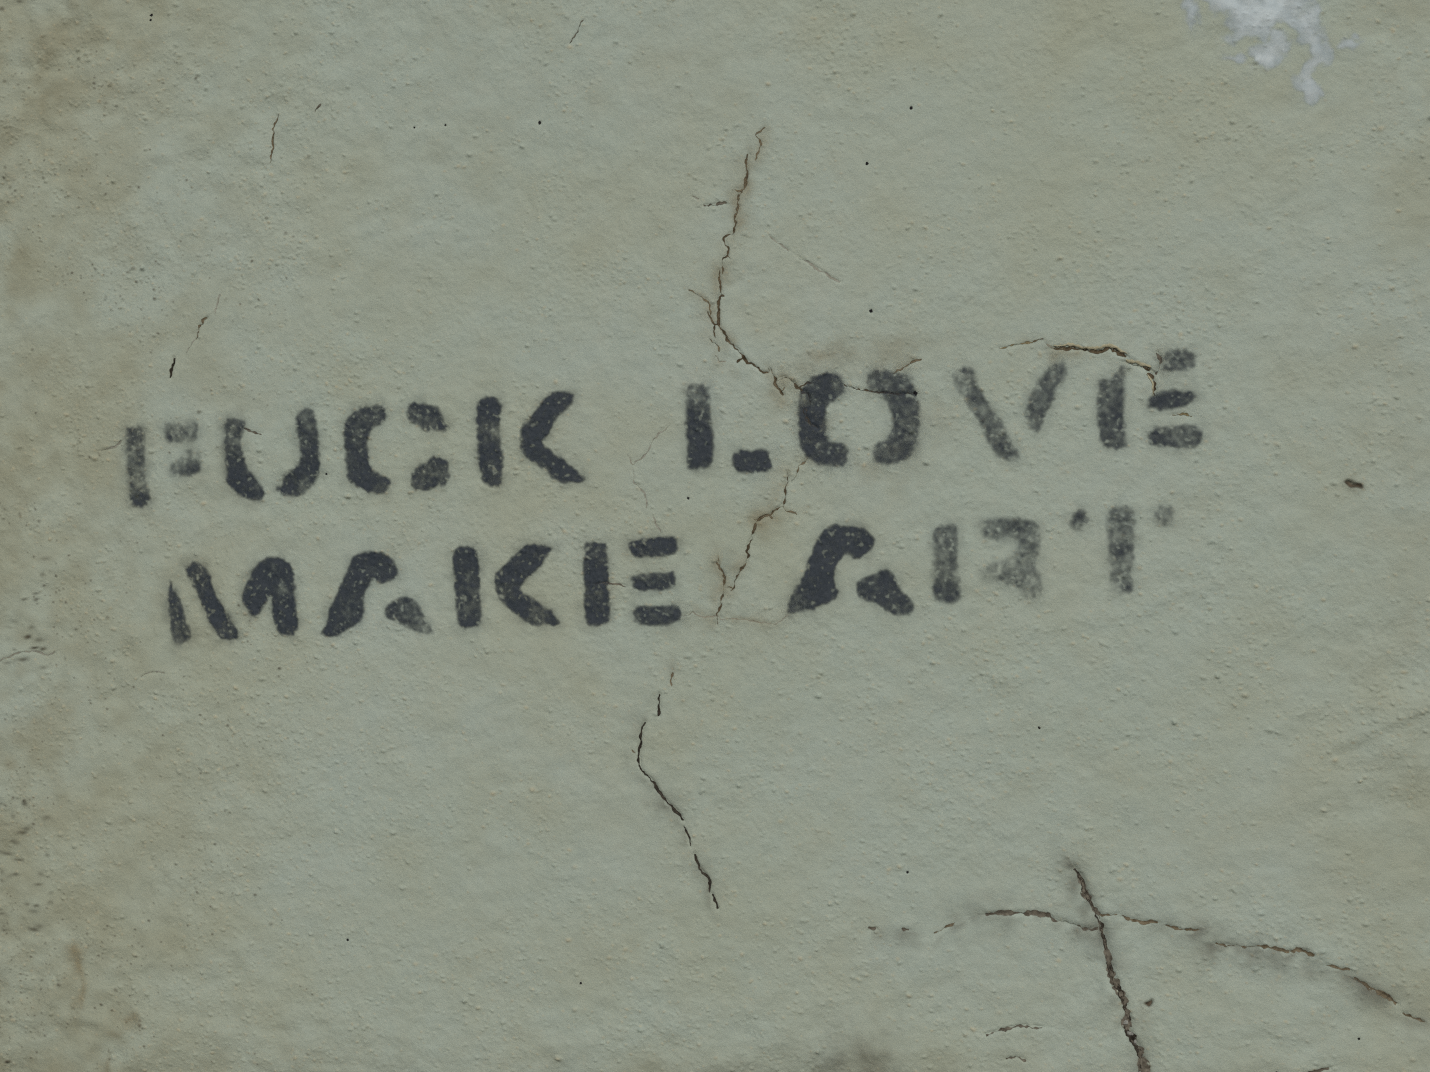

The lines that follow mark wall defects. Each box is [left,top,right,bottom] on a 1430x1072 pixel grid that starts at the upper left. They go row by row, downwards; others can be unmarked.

crack [682,127,922,625]
crack [1001,338,1192,417]
crack [631,672,719,909]
crack [868,868,1425,1072]